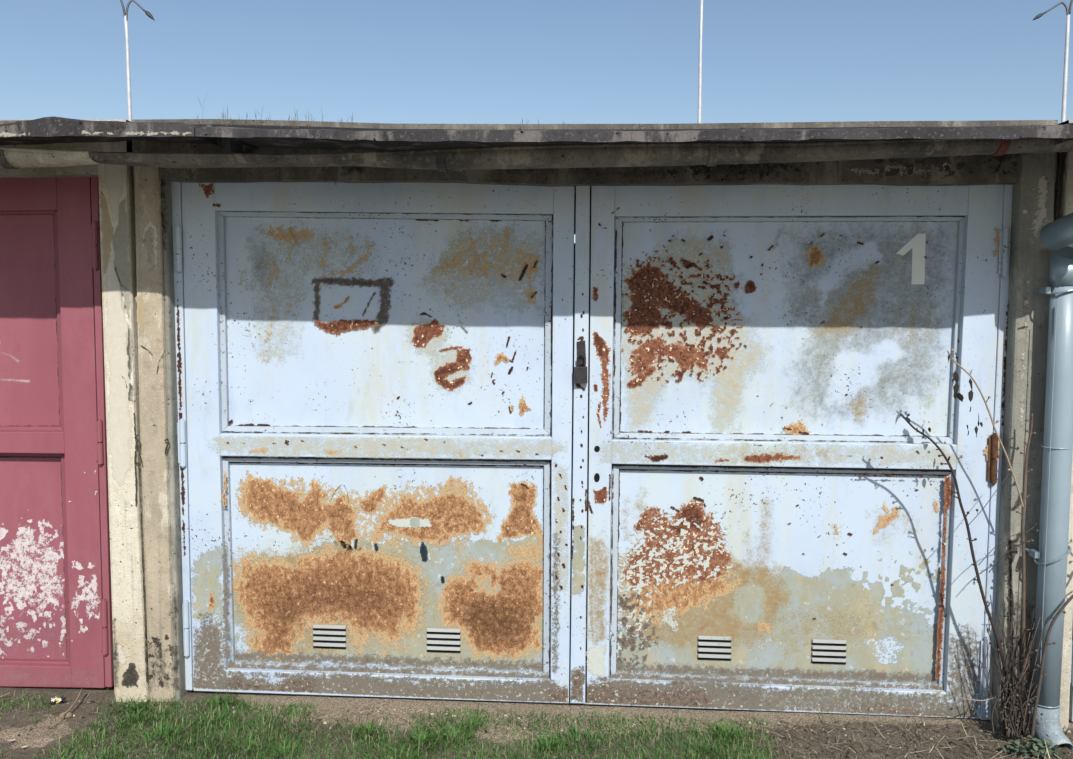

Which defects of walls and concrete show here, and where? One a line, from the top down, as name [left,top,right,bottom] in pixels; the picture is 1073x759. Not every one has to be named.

peeling [0,518,101,641]
corrosion [208,470,544,667]
corrosion [409,312,472,391]
corrosion [588,474,611,513]
corrosion [592,235,765,434]
corrosion [587,497,788,679]
corrosion [778,420,810,435]
corrosion [873,505,912,535]
corrosion [933,476,953,679]
corrosion [984,306,1008,462]